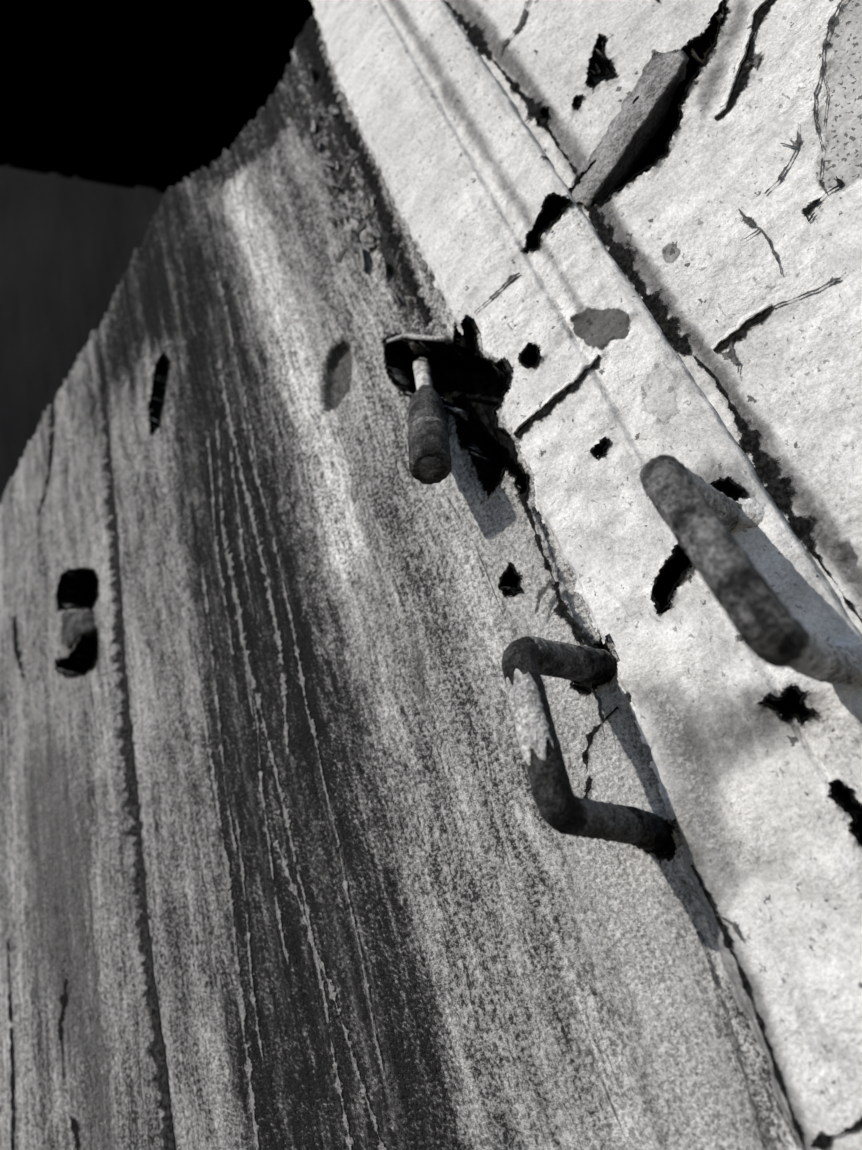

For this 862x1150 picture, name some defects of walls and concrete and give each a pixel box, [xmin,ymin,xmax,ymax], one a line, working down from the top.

spalling [584,33,618,88]
peeling [816,0,862,191]
crack [444,0,862,622]
crack [517,490,598,649]
crack [581,681,619,799]
corrosion [688,694,793,761]
spalling [757,683,818,726]
spalling [827,779,862,847]
crack [690,864,862,1150]